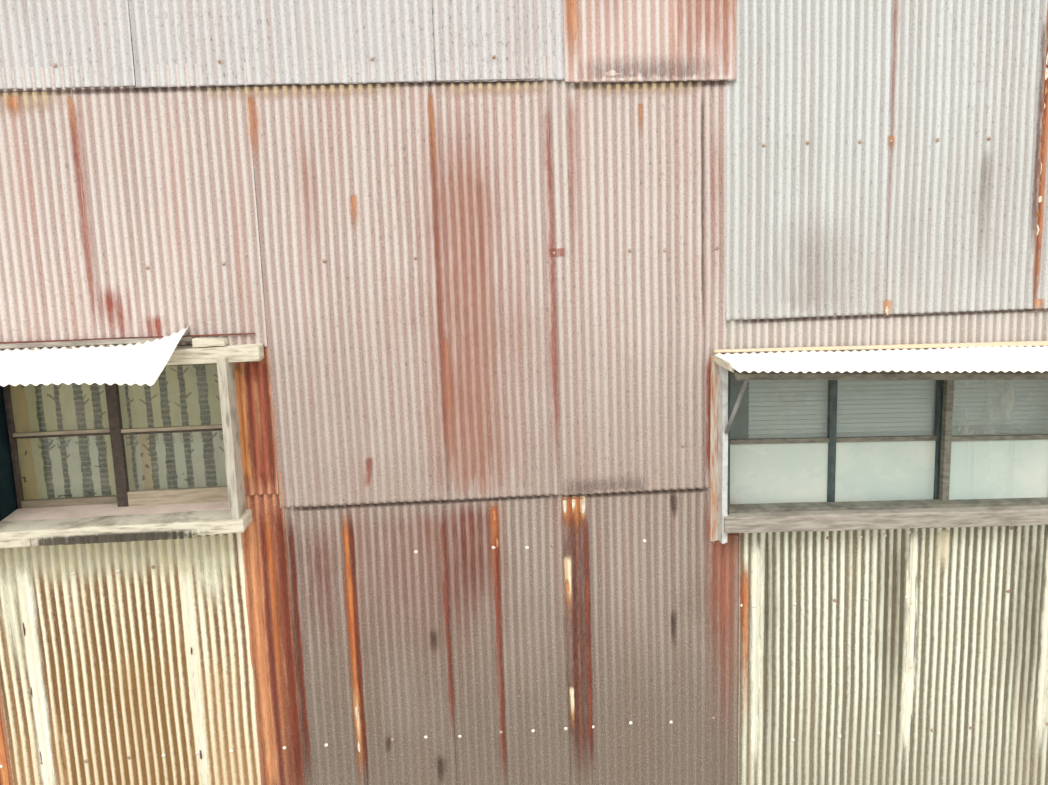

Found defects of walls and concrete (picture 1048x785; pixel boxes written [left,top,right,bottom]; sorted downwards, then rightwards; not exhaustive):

rust [567,0,578,42]
rust [428,97,463,433]
rust [234,361,275,484]
rust [246,514,310,785]
rust [343,523,368,777]
rust [441,523,453,714]
rust [461,507,506,758]
rust [707,522,736,682]